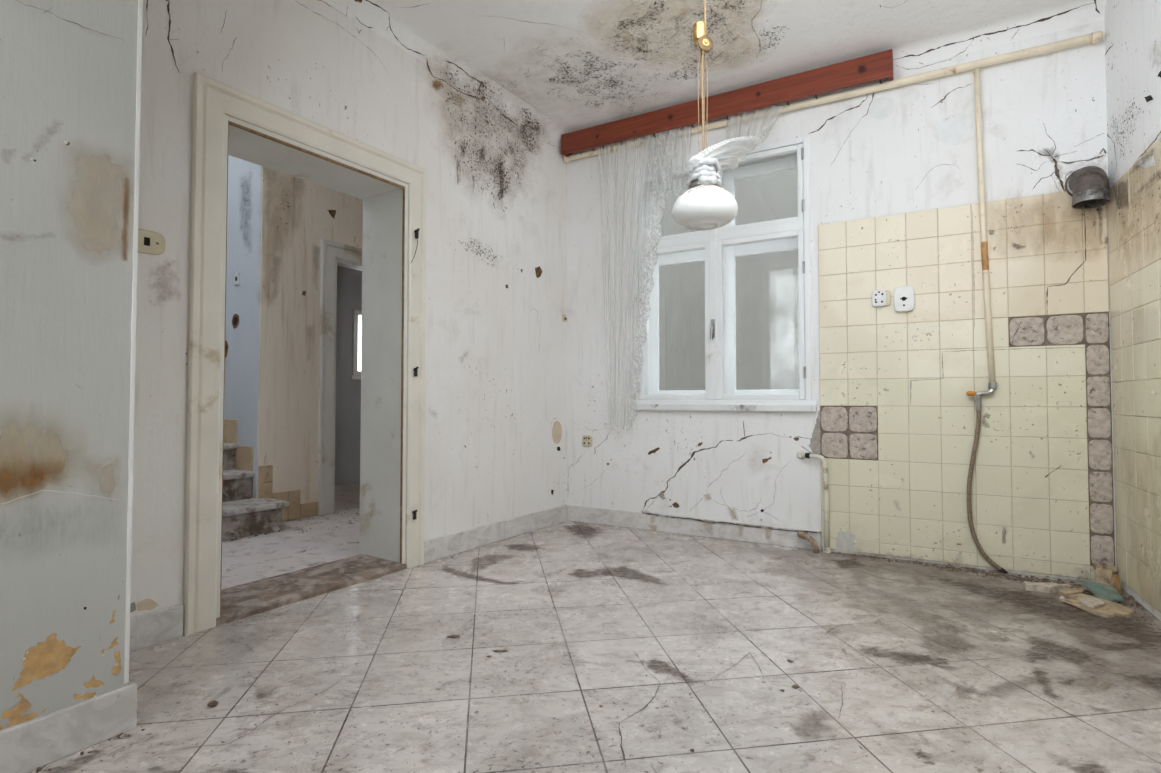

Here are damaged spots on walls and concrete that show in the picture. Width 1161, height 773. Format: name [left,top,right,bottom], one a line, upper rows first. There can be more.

crack [16,0,180,73]
crack [295,0,425,66]
damp [519,0,789,111]
damp [427,61,544,211]
crack [1019,123,1161,192]
crack [910,215,1039,387]
crack [1046,211,1086,312]
crack [644,421,813,522]
peeling [0,633,81,730]
peeling [73,610,122,700]